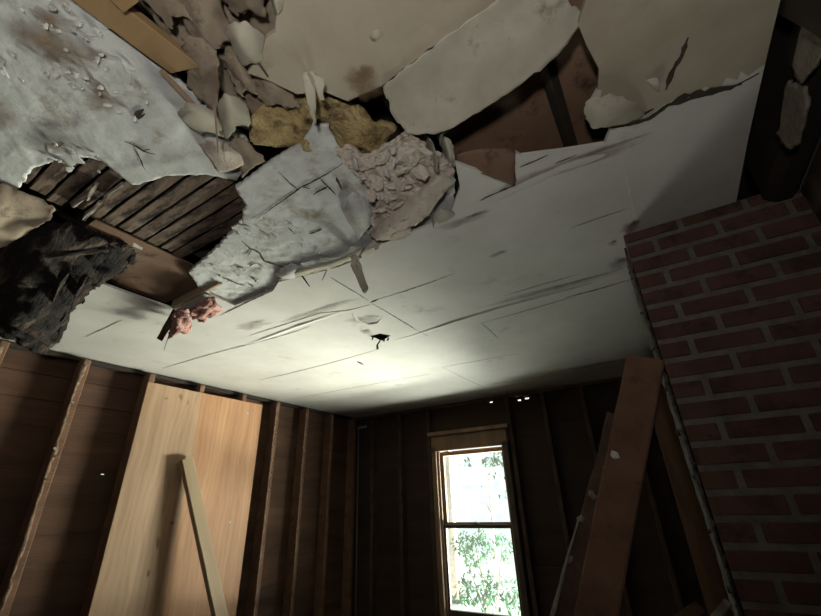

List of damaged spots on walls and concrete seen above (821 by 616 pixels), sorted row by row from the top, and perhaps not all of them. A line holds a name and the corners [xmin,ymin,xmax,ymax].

spalling [35,0,136,113]
peeling [225,21,266,66]
spalling [47,141,101,173]
peeling [178,93,266,178]
spalling [231,220,257,235]
spalling [265,129,456,293]
crack [222,242,289,315]
crack [164,273,454,368]
crack [293,274,631,399]